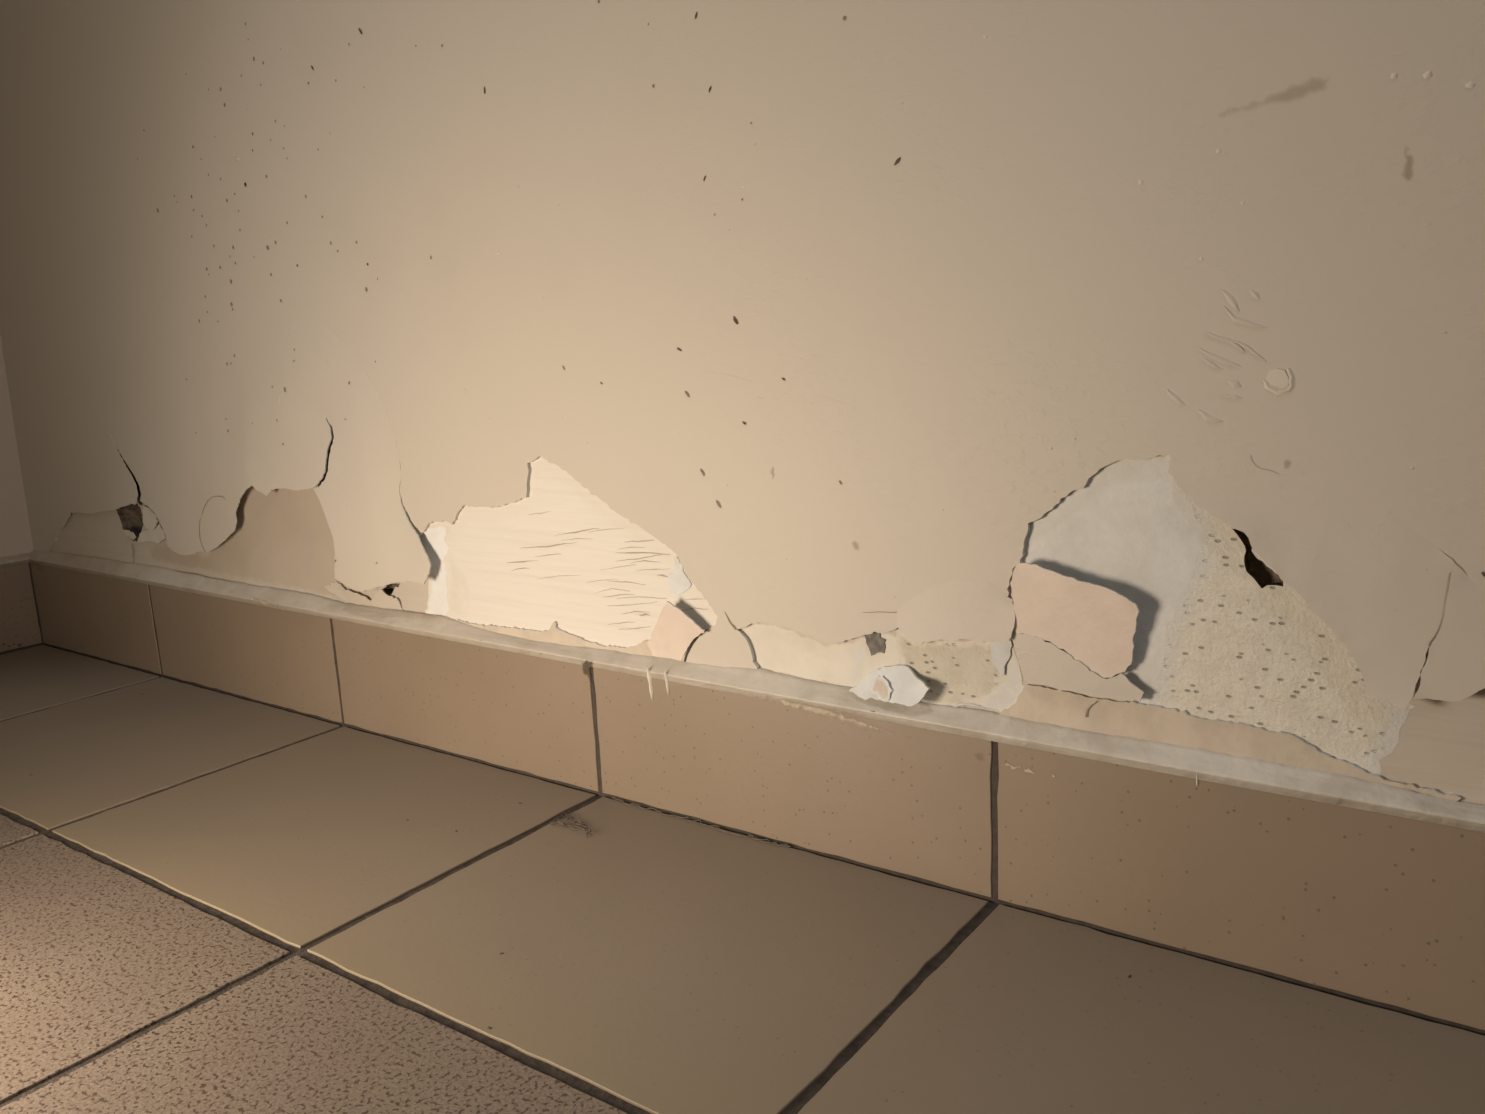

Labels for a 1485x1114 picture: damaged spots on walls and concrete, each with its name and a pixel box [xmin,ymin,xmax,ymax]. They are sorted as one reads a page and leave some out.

peeling [47,317,717,661]
peeling [740,455,1485,801]